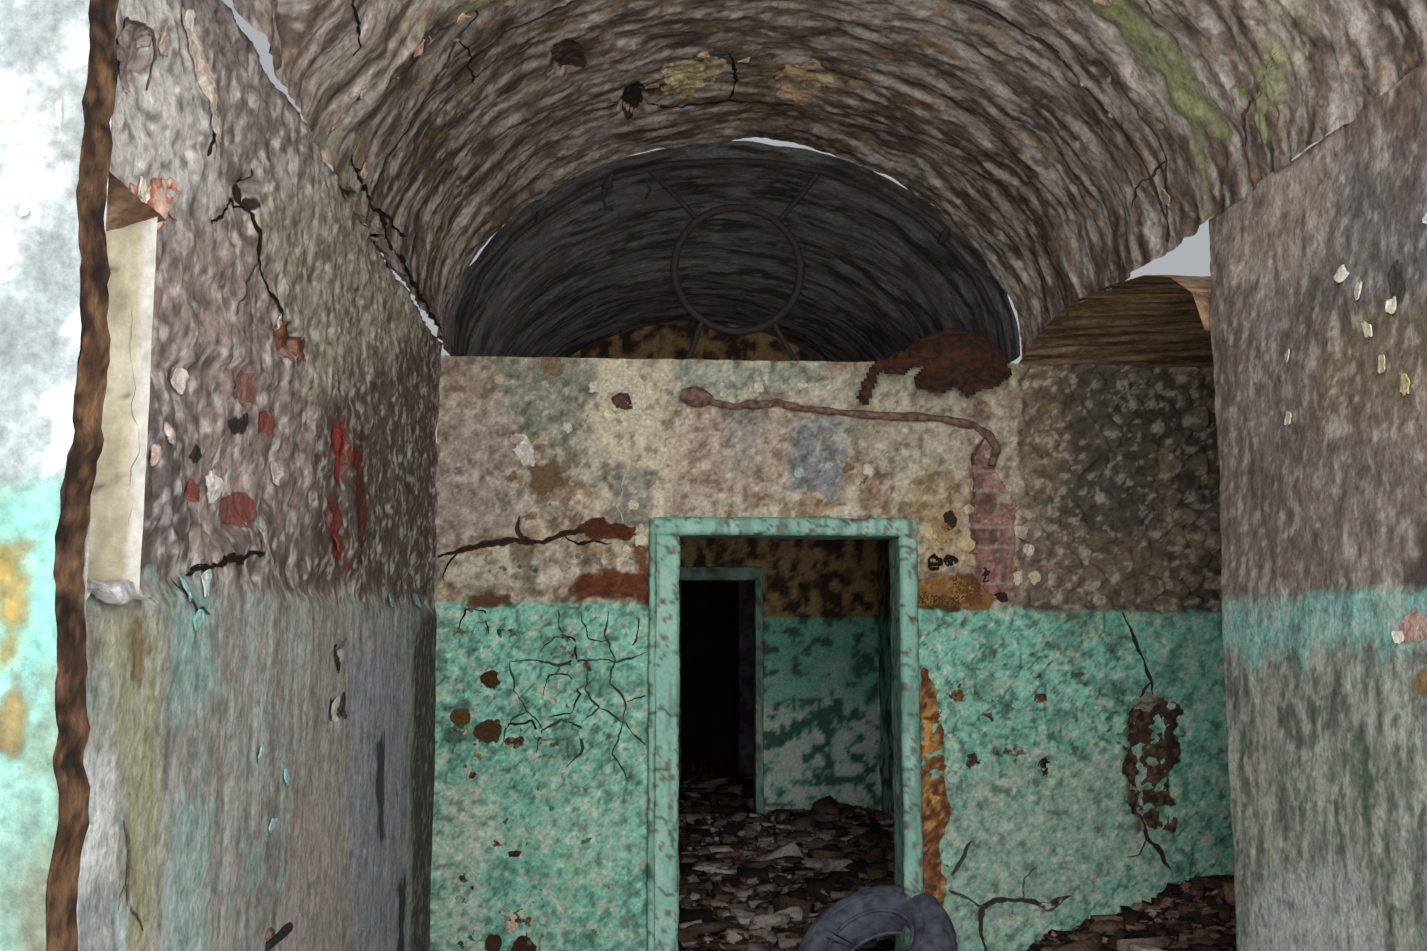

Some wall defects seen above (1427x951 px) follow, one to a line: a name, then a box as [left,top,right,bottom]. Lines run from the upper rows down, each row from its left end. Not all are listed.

damp [1086,0,1231,191]
damp [1252,0,1309,145]
crack [211,168,284,323]
damp [339,168,357,197]
peeling [1377,354,1411,396]
spalling [46,0,222,951]
crack [185,550,266,576]
rust [323,414,373,565]
crack [437,516,636,581]
flaking render [616,464,649,561]
flaking render [1122,692,1186,833]
crack [949,841,1071,951]